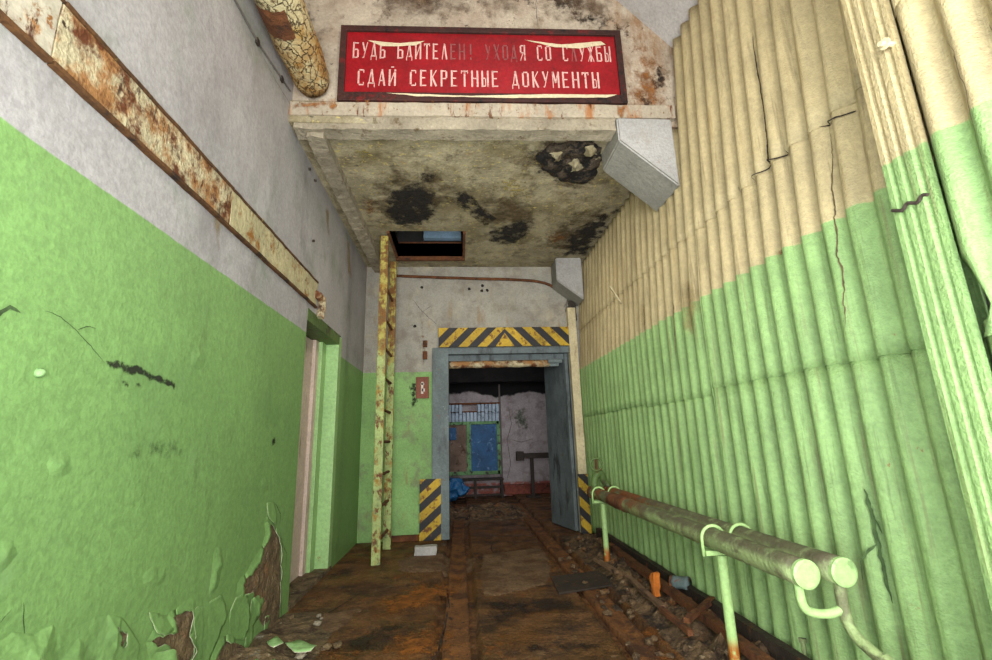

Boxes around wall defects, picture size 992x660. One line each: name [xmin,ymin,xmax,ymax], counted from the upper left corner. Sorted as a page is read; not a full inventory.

corrosion [630,48,657,105]
crack [751,33,788,183]
damp [372,142,589,244]
spalling [535,141,602,185]
damp [548,210,618,256]
crack [819,111,856,335]
crack [47,311,104,362]
peeling [0,502,283,660]